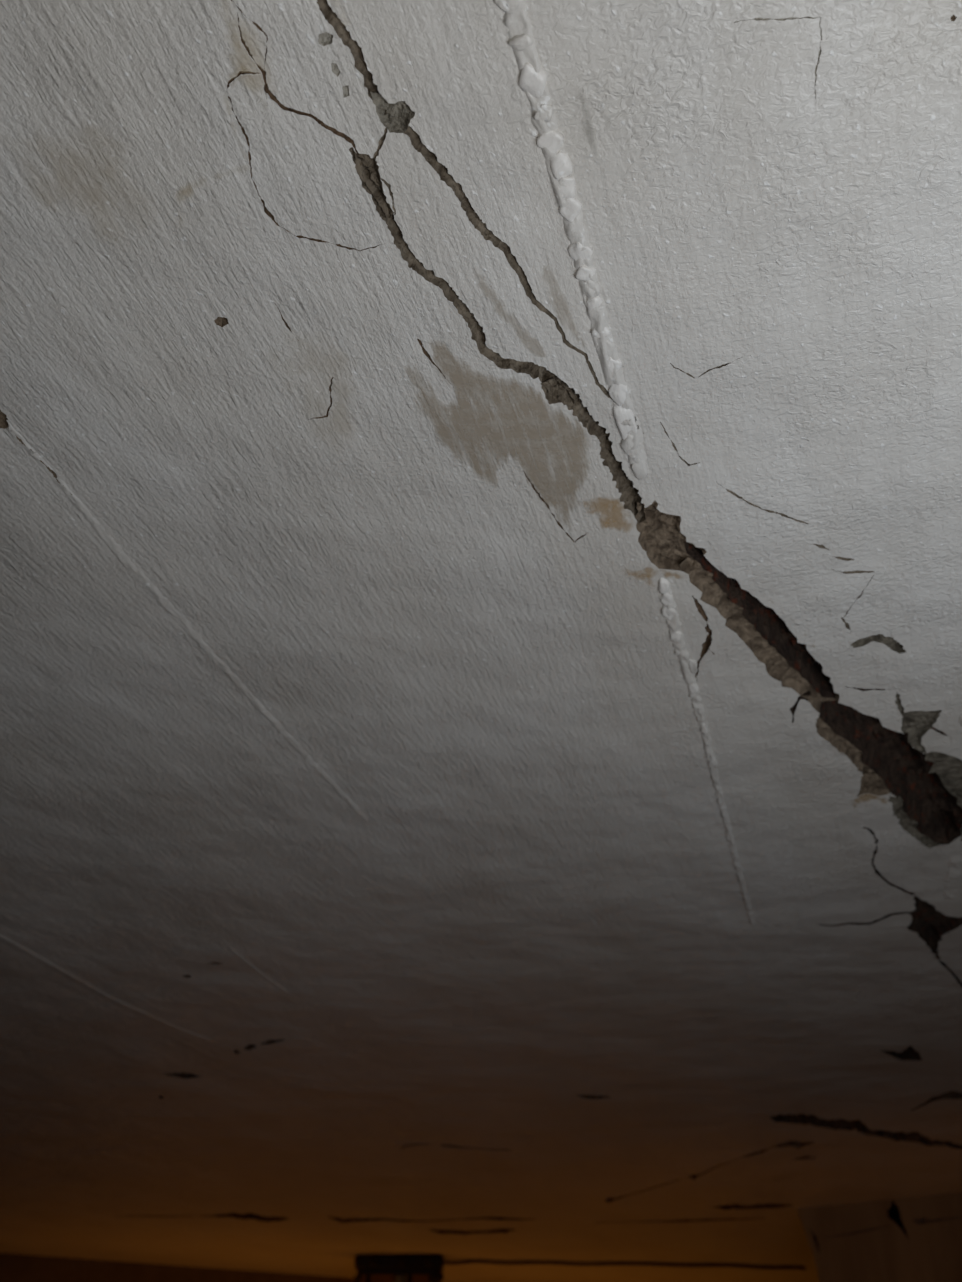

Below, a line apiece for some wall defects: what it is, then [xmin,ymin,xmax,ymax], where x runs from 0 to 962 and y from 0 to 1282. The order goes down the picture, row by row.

peeling [493,0,648,480]
crack [227,0,962,848]
spalling [841,617,906,654]
peeling [658,578,755,926]
spalling [817,827,962,988]
crack [233,1039,285,1054]
spalling [880,1046,922,1061]
crack [605,1091,962,1203]
crack [114,1212,289,1222]
crack [328,1217,535,1235]
crack [714,1203,820,1253]